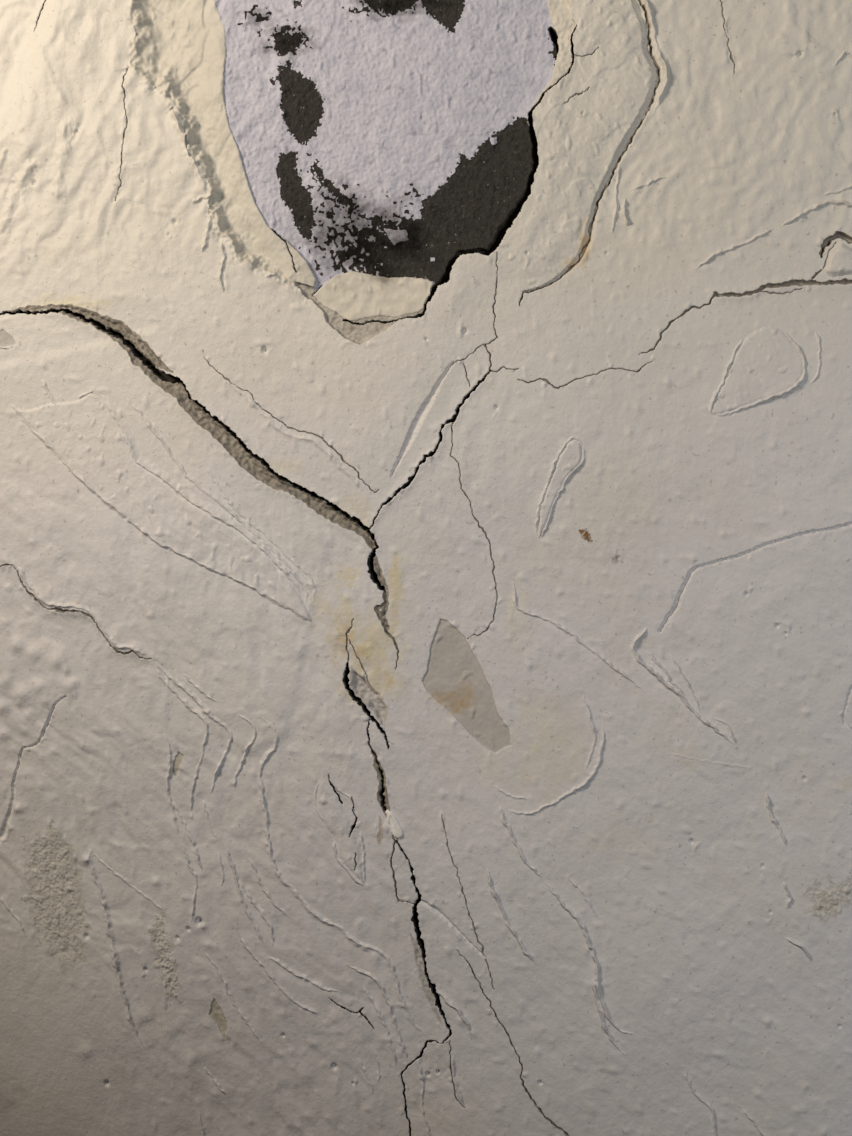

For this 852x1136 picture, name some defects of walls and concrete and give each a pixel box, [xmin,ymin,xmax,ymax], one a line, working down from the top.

peeling [129,0,577,345]
crack [0,252,852,1136]
peeling [422,619,511,753]